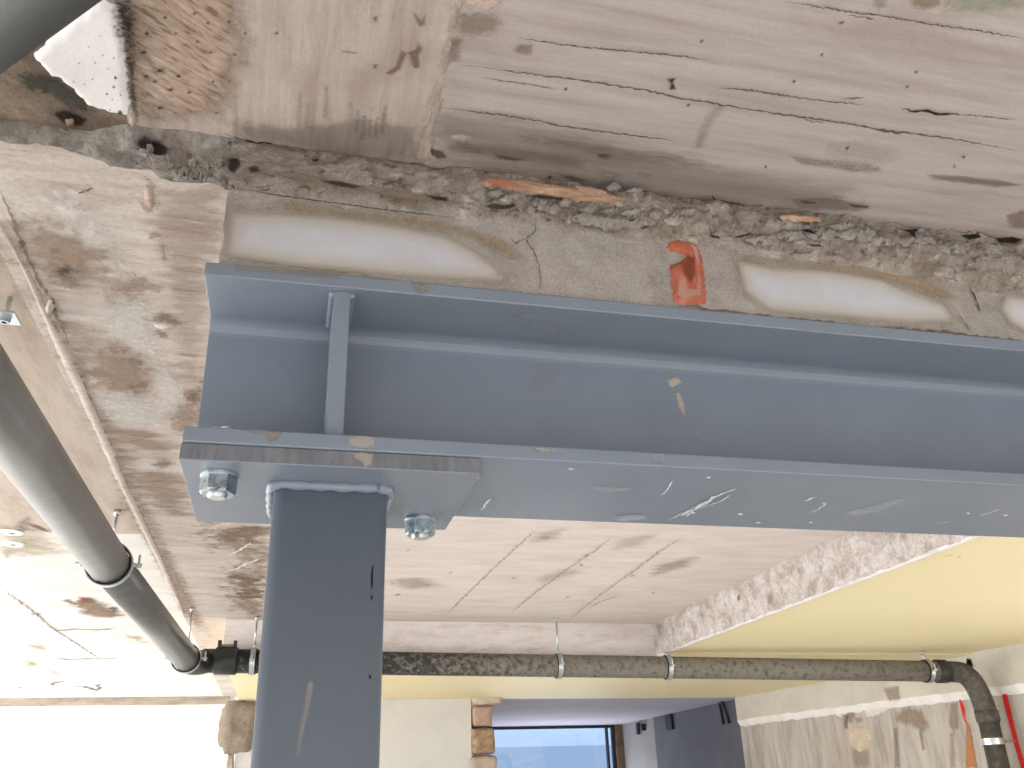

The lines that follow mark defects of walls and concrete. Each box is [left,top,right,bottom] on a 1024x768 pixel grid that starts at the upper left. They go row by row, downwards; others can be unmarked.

crack [523,38,709,60]
crack [787,2,1022,39]
crack [440,65,1024,152]
peeling [431,134,478,159]
spalling [255,170,462,204]
flaking render [481,173,685,226]
peeling [870,232,936,247]
leakage [95,302,181,429]
leakage [135,499,202,625]
crack [450,531,534,611]
crack [513,538,611,611]
crack [568,538,682,620]